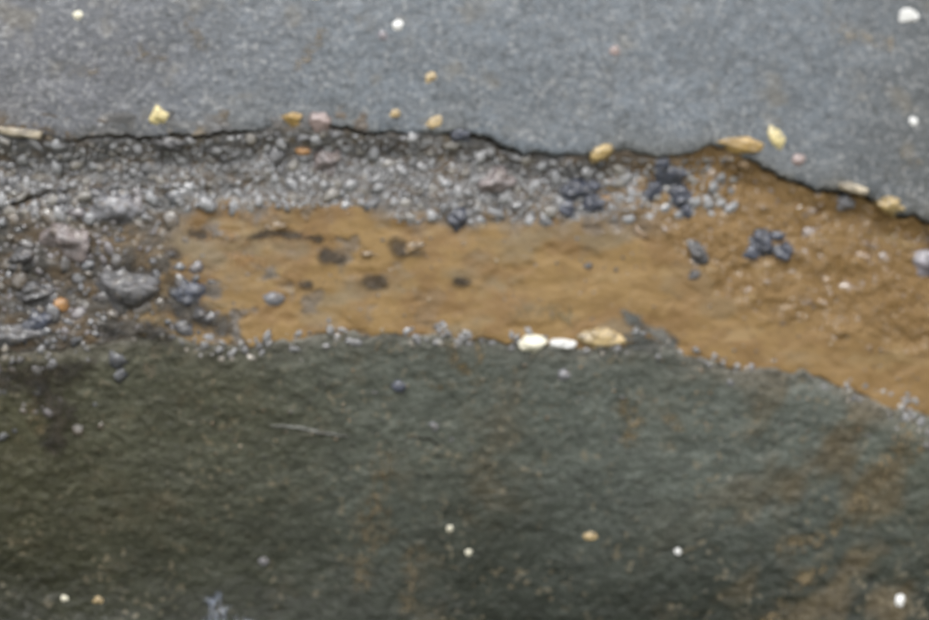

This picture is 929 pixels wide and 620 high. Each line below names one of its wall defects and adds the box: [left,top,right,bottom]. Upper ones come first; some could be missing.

crack [63,130,255,142]
crack [330,125,410,136]
crack [440,132,550,167]
crack [723,157,929,235]
spalling [0,105,929,450]